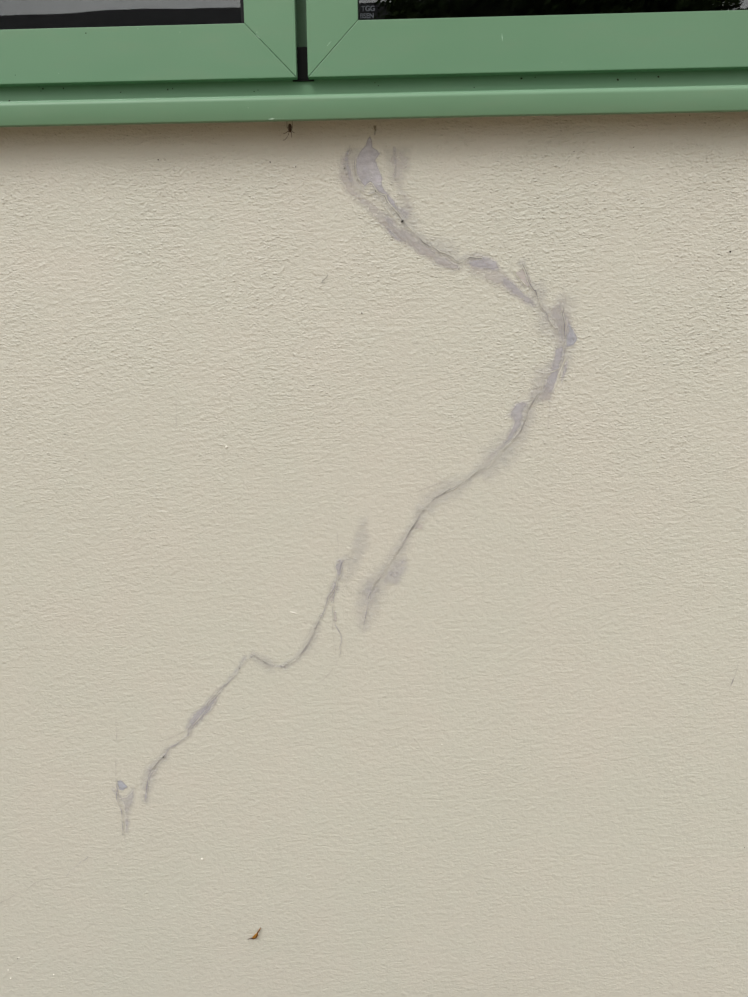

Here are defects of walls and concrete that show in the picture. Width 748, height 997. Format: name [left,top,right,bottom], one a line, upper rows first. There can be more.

crack [353,160,486,264]
crack [364,264,566,623]
crack [145,532,345,800]